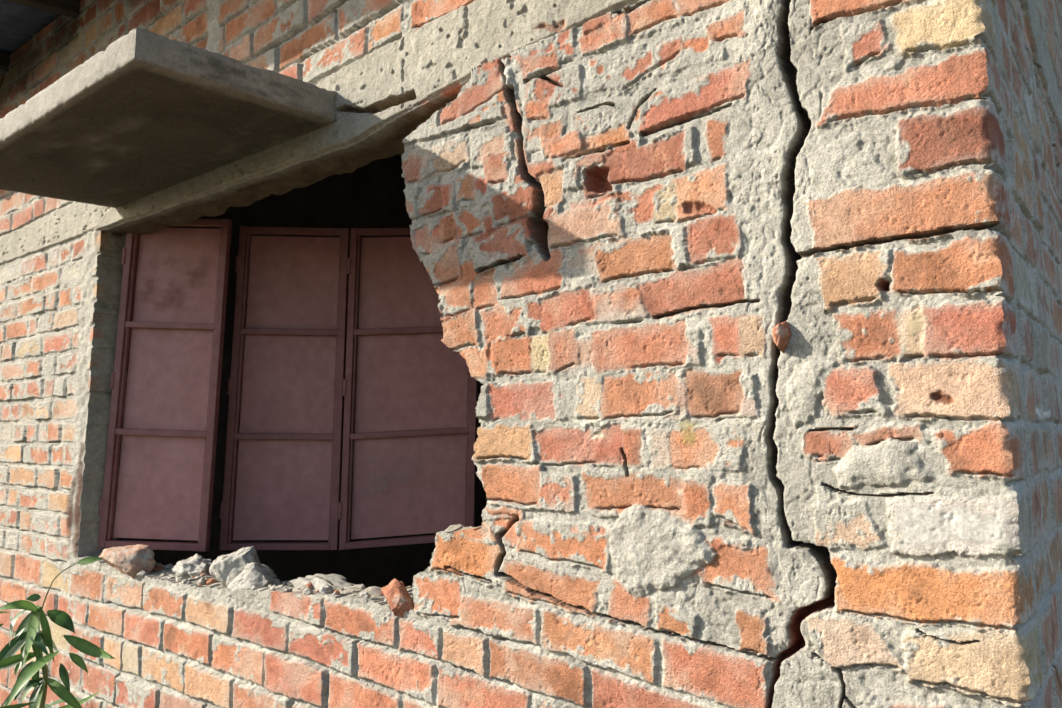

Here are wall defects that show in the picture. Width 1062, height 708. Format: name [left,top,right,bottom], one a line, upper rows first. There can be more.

spalling [382,578,415,618]
crack [444,0,1000,708]